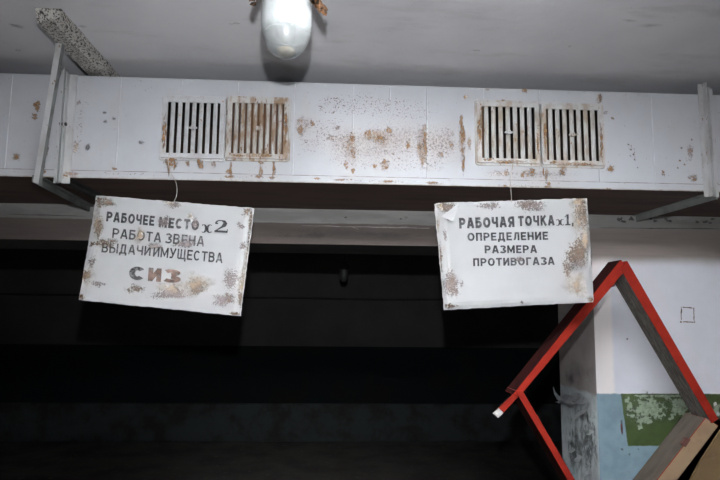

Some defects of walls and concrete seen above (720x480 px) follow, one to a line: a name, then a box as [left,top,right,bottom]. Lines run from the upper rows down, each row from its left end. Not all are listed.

corrosion [297,95,482,183]
corrosion [225,154,276,179]
corrosion [499,161,591,188]
peeling [625,392,691,430]